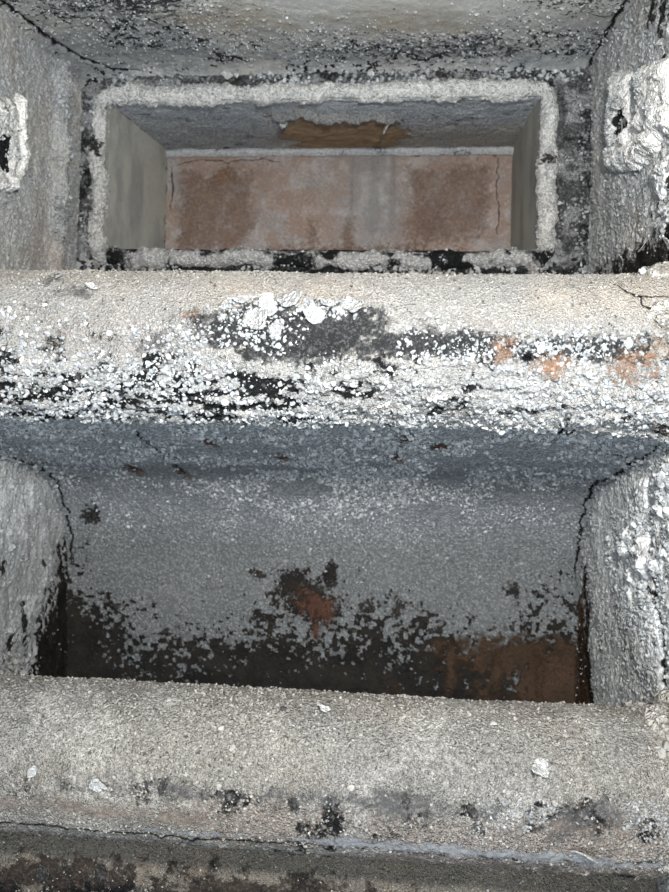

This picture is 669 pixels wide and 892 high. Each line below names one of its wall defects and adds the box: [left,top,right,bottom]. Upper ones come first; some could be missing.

peeling [263,107,411,149]
crack [0,456,76,565]
crack [574,445,660,588]
rust [432,632,577,704]
crack [0,821,532,862]
crack [560,858,669,866]